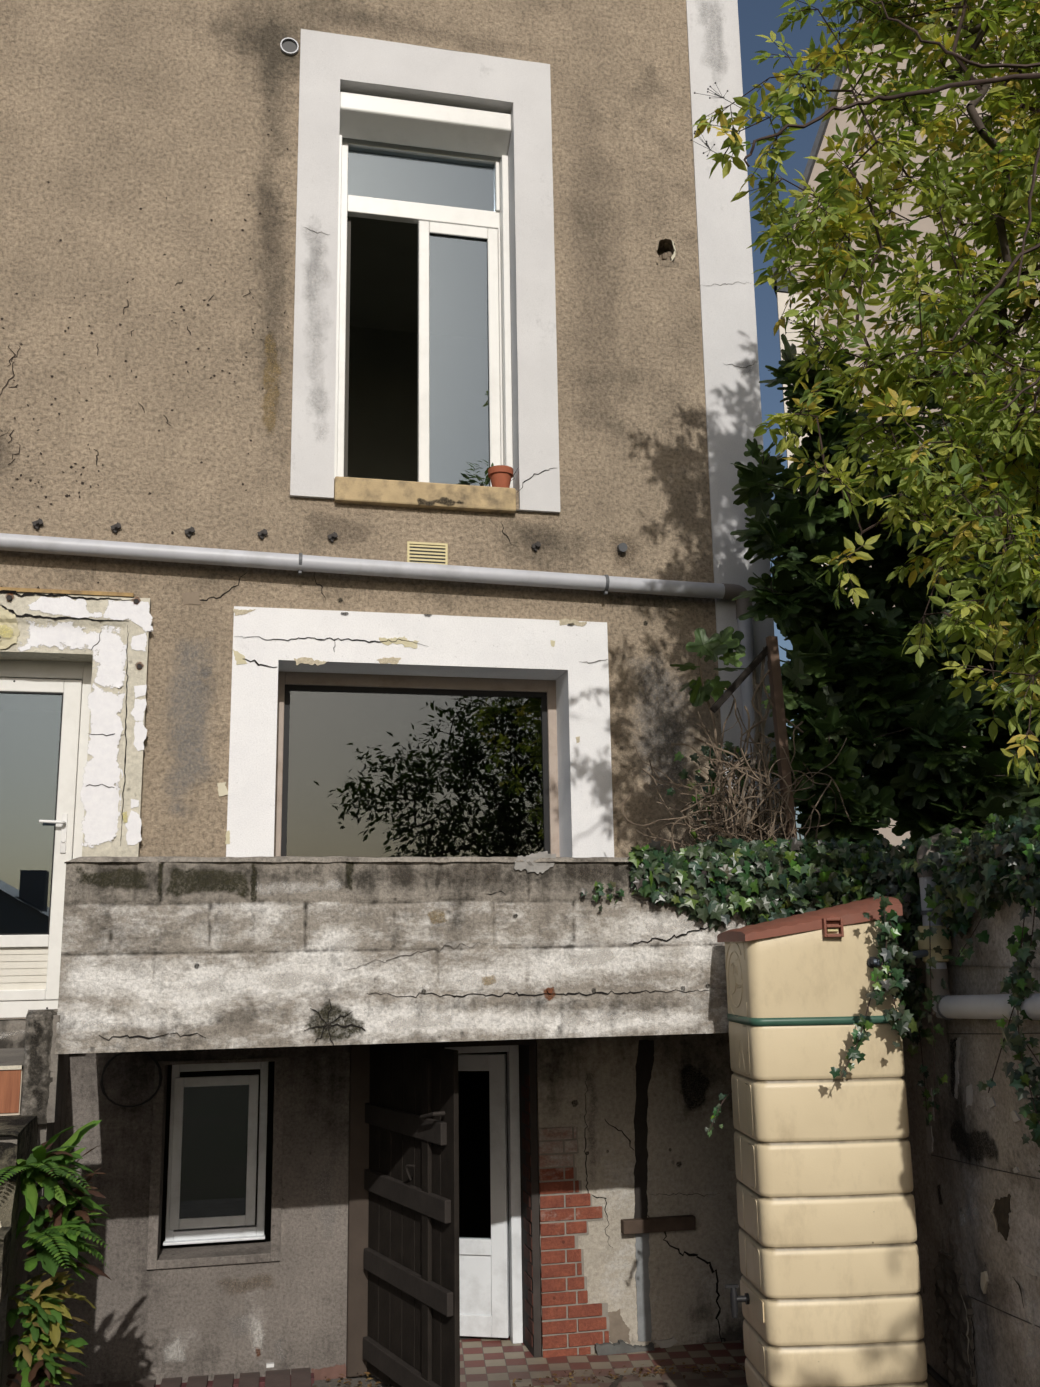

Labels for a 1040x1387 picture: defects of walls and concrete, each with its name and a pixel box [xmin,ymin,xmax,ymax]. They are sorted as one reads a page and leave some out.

crack [200,573,246,601]
crack [236,636,425,668]
peeling [18,596,153,848]
water stain [259,881,338,894]
crack [304,942,709,1045]
crack [99,1033,206,1041]
water stain [306,1004,363,1040]
flaking render [521,1074,631,1358]
spalling [993,1194,1011,1241]
crack [647,1193,726,1342]